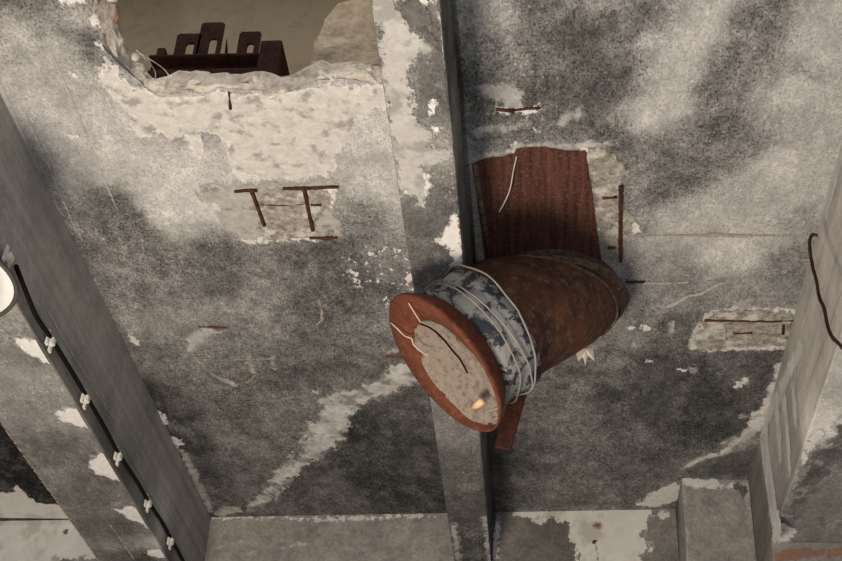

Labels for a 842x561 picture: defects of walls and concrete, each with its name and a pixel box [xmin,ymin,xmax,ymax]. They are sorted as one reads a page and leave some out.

peeling [59,0,453,247]
water stain [471,83,542,139]
water stain [558,108,582,126]
spalling [469,139,642,263]
water stain [341,246,414,291]
spalling [689,305,795,352]
water stain [178,450,437,523]
peeling [510,481,680,561]